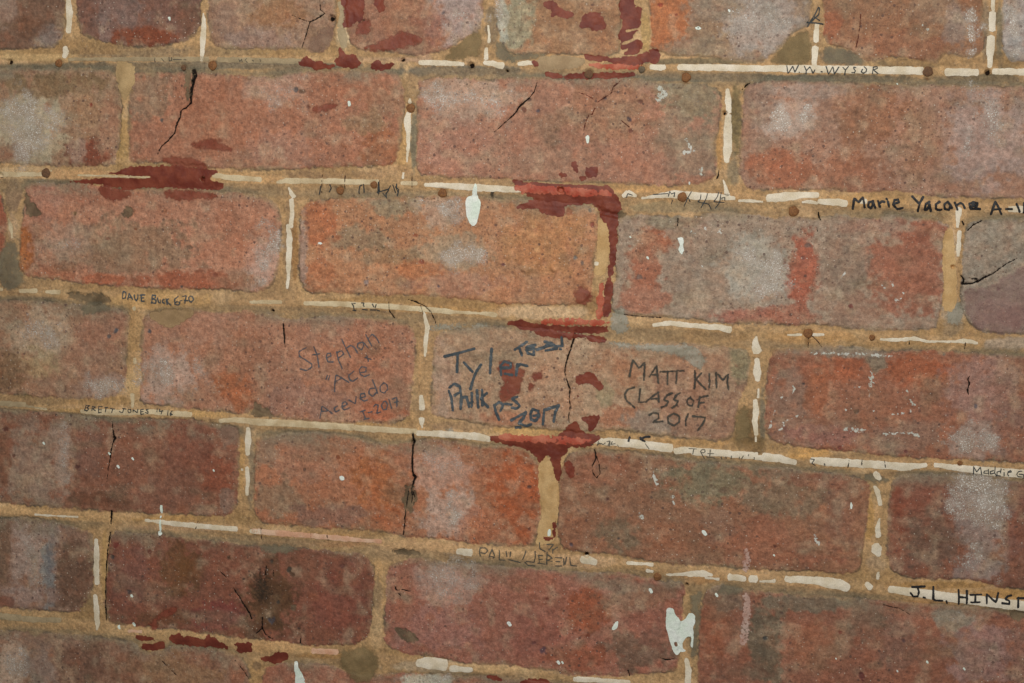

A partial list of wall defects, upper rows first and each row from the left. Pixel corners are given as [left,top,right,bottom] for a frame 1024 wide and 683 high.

crack [157,69,197,154]
crack [494,83,537,132]
crack [961,259,1015,285]
crack [564,332,576,420]
crack [107,423,116,477]
crack [403,433,417,535]
crack [105,510,113,620]